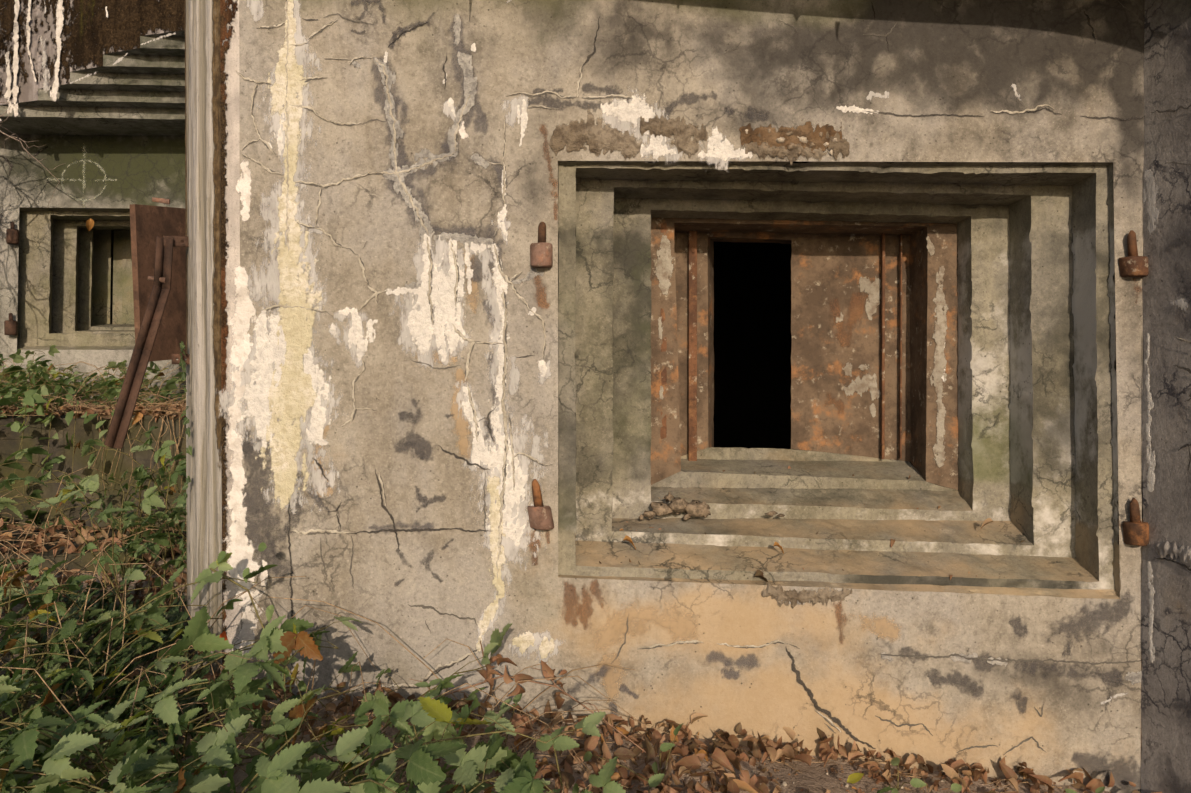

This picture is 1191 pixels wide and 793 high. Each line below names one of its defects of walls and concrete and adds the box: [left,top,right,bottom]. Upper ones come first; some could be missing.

water stain [4,0,96,117]
crack [577,17,600,97]
crack [836,84,1191,121]
spalling [550,105,850,165]
crack [235,13,551,384]
peeling [366,319,378,343]
crack [478,407,550,466]
crack [1178,444,1191,472]
crack [287,445,490,619]
corrosion [564,580,603,628]
crack [612,615,933,749]
crack [957,704,1044,755]